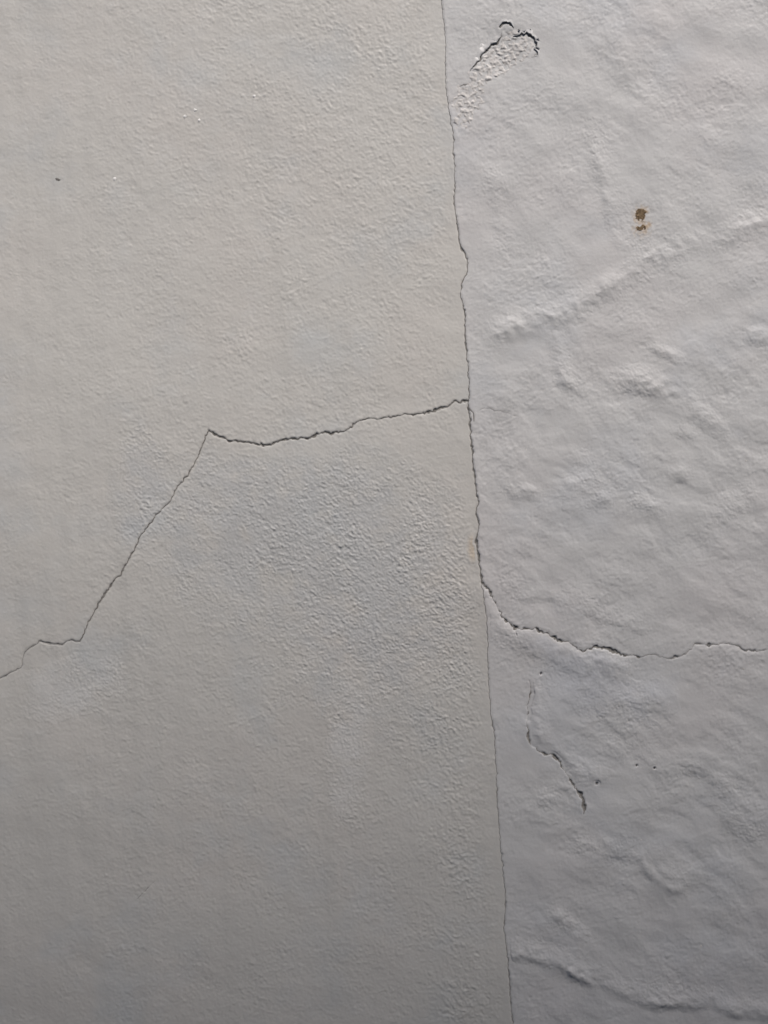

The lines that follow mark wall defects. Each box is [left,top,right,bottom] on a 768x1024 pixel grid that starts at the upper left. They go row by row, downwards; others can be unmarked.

spalling [451,19,541,130]
corrosion [628,202,653,240]
crack [1,6,768,678]
crack [526,692,587,812]
crack [488,662,514,1024]